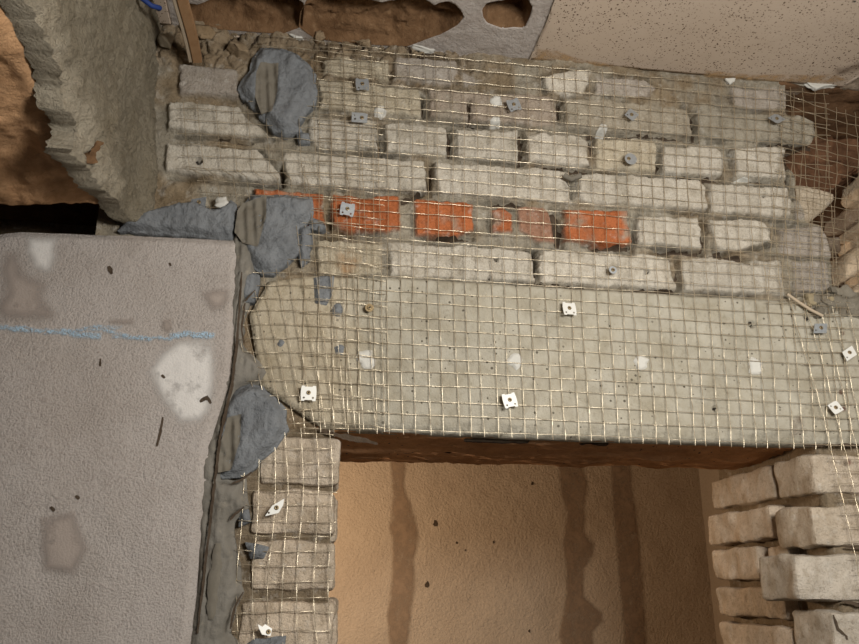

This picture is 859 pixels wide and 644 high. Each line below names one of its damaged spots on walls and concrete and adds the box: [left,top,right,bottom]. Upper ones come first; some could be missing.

flaking render [0,5,99,206]
spalling [85,141,104,164]
flaking render [189,0,555,60]
spalling [779,75,859,292]
damp [388,461,417,644]
damp [559,467,601,644]